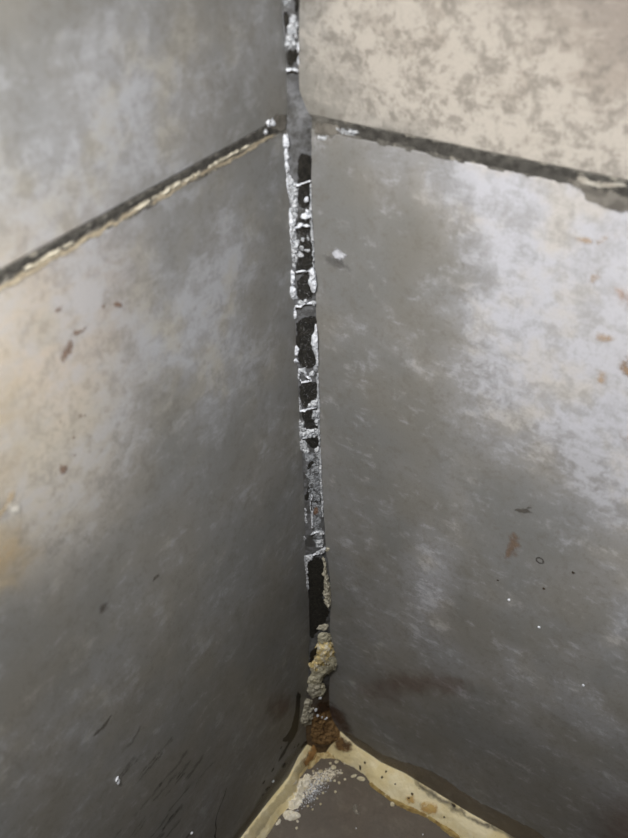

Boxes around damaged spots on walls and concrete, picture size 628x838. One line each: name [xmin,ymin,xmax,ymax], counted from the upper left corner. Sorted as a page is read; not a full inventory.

leakage [271,674,327,772]
leakage [276,768,342,825]